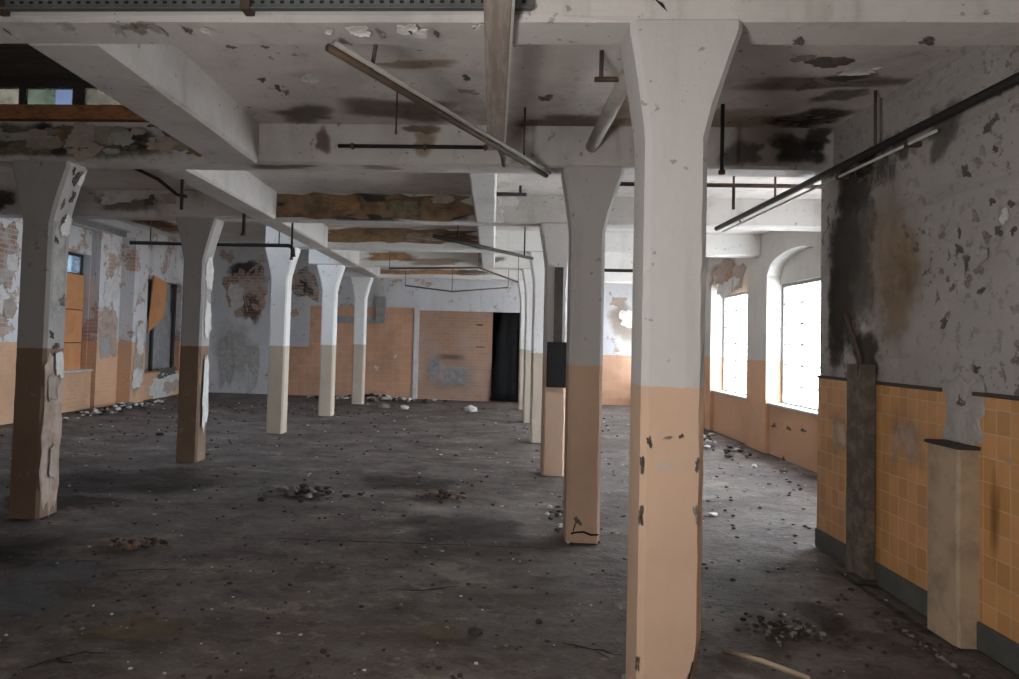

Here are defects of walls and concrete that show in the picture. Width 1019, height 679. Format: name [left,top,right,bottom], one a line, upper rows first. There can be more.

leakage [526,116,598,126]
leakage [724,143,759,164]
leakage [756,75,903,163]
leakage [931,104,956,161]
spalling [961,157,983,177]
spalling [983,115,997,135]
peeling [0,121,202,319]
flaking render [204,256,270,338]
leakage [828,139,907,373]
peeling [955,198,1017,295]